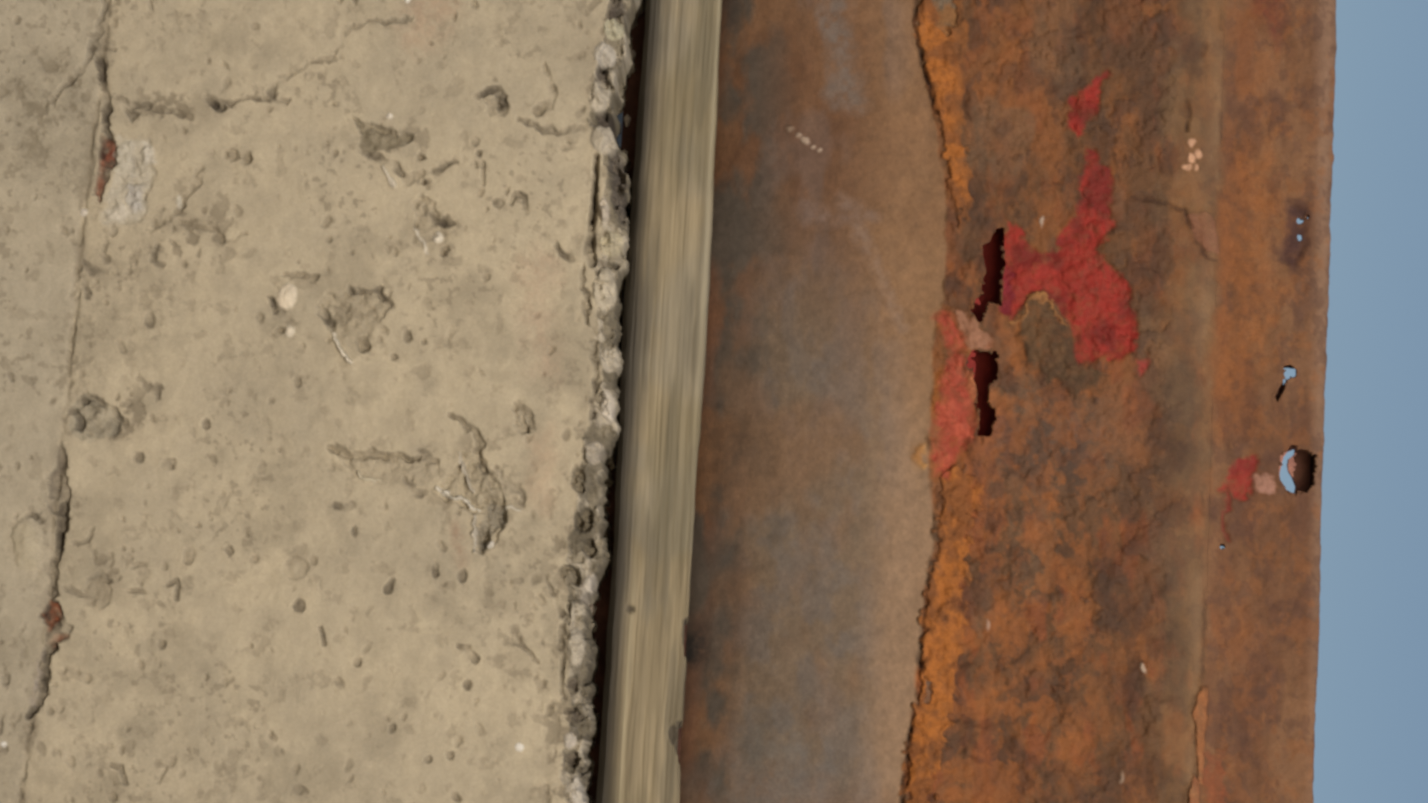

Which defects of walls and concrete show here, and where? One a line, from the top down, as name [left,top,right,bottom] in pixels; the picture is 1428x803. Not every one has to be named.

crack [62,219,118,380]
crack [48,0,415,143]
spalling [323,0,646,803]
rust [911,0,985,230]
peeling [908,303,995,484]
rust [1003,291,1114,403]
peeling [995,66,1153,380]
rust [1201,121,1317,452]
crack [13,437,76,803]
rust [897,464,986,803]
rust [1181,684,1211,803]